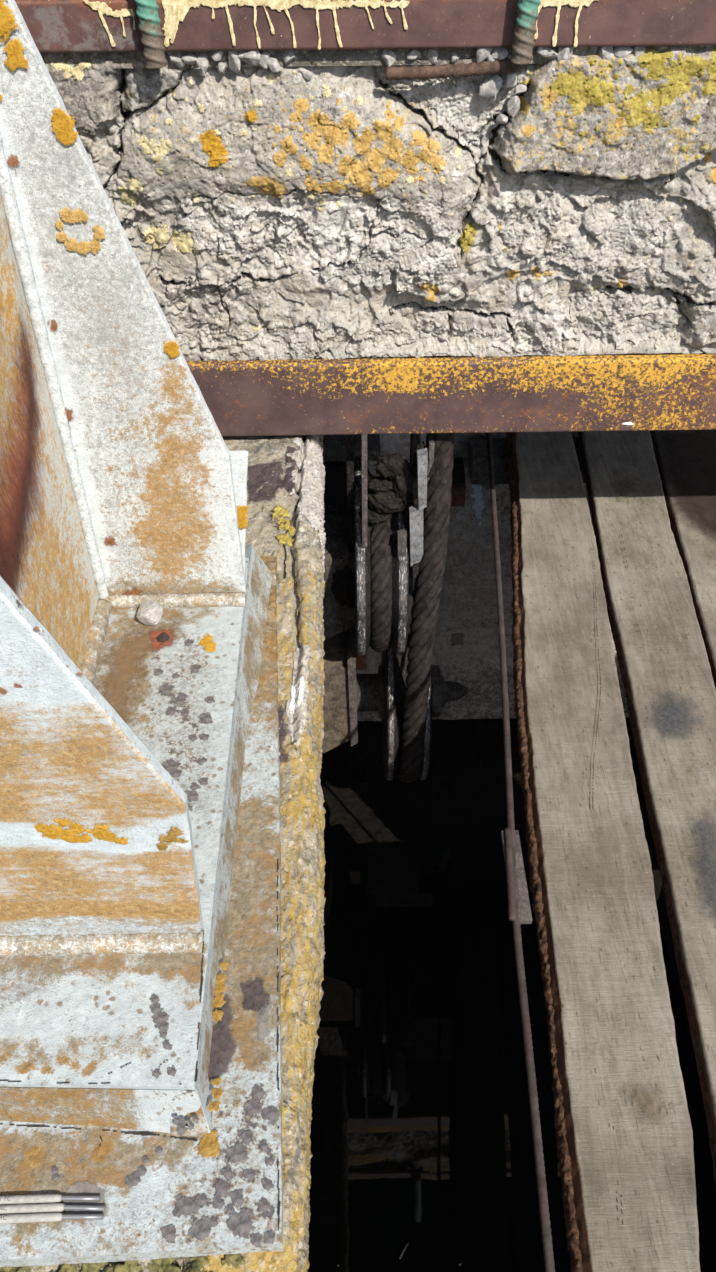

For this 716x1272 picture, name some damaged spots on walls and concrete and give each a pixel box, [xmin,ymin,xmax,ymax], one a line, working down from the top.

spalling [40,52,146,69]
crack [104,68,184,187]
rust [7,154,20,167]
crack [378,81,531,242]
crack [540,170,610,180]
crack [389,301,512,328]
crack [605,285,714,336]
rust [0,329,41,590]